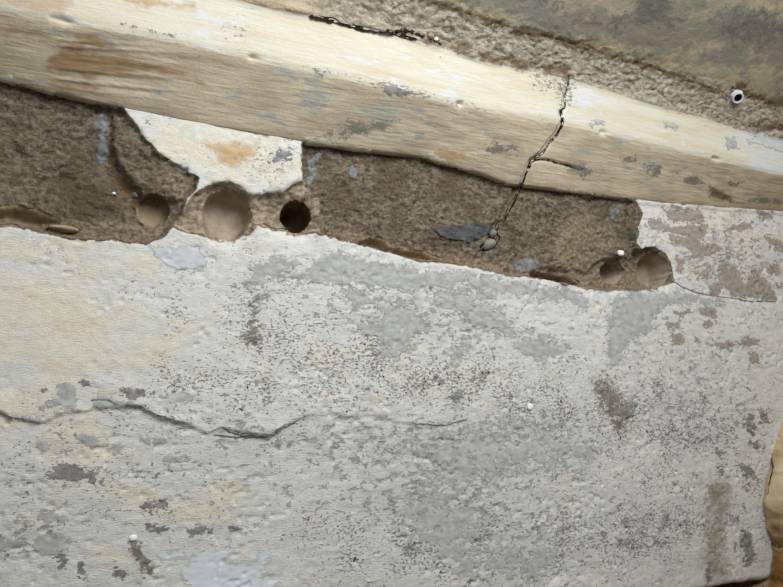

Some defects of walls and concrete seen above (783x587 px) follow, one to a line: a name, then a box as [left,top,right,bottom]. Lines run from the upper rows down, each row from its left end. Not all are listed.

crack [309,15,423,40]
spalling [0,73,783,368]
crack [480,77,580,257]
crack [219,421,296,438]